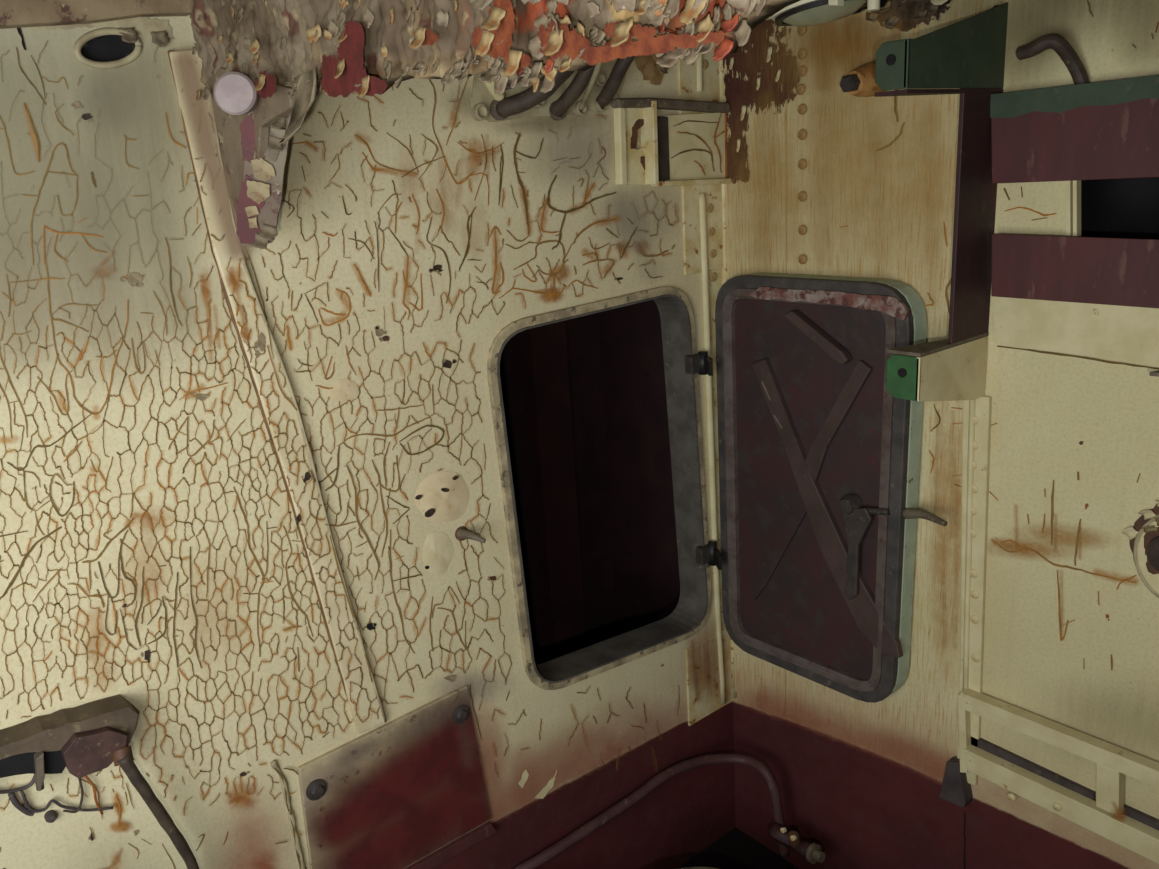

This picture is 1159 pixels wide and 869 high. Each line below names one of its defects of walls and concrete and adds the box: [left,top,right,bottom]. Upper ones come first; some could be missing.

crack [671,113,726,175]
crack [245,77,668,416]
crack [0,28,210,669]
crack [168,383,246,458]
crack [233,487,313,672]
crack [311,385,482,740]
peeling [1122,500,1159,553]